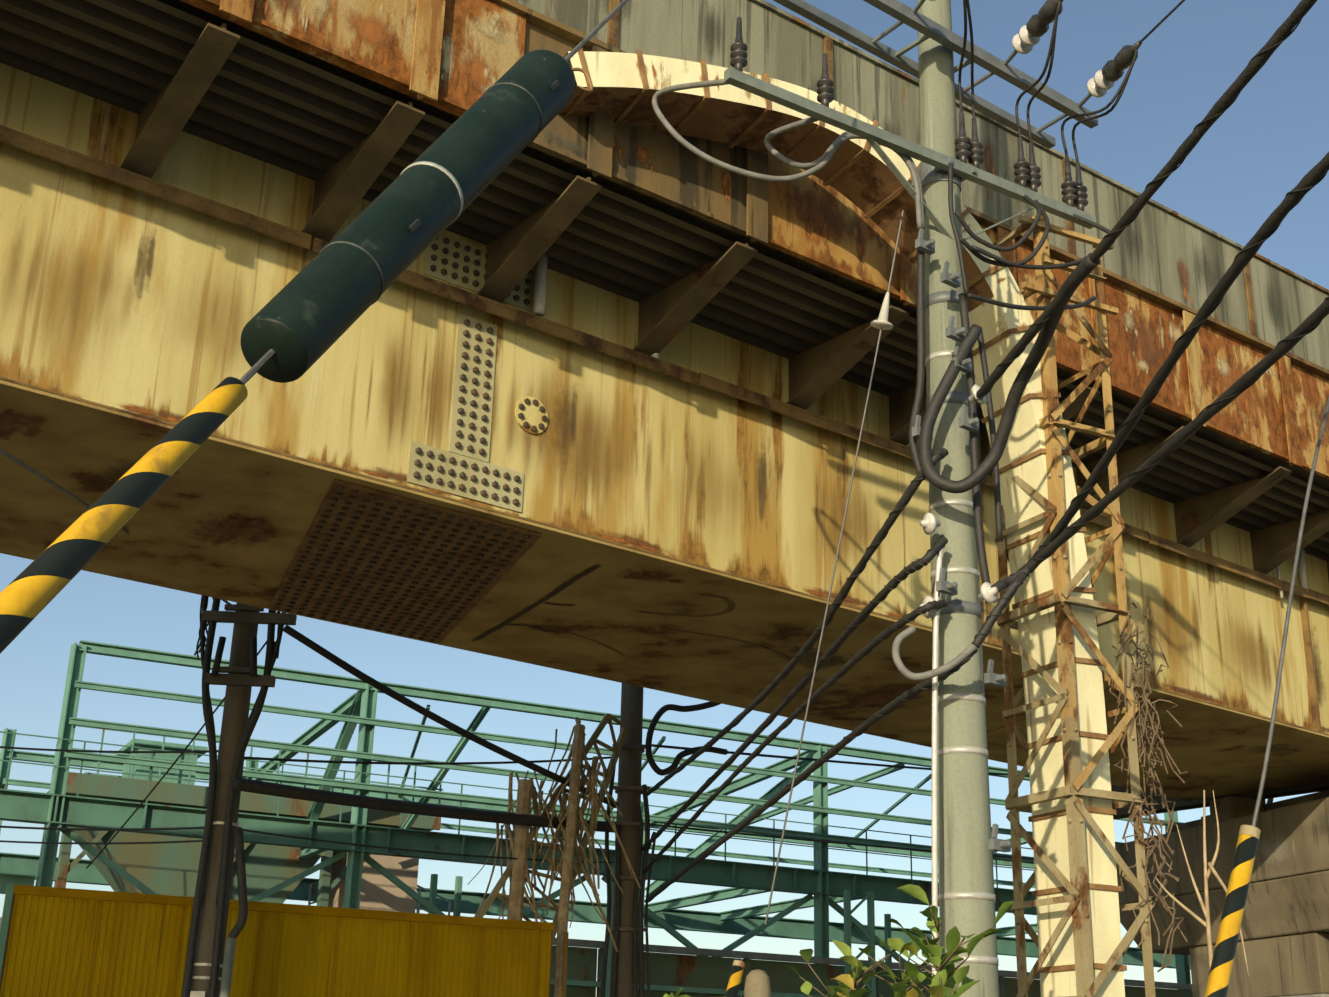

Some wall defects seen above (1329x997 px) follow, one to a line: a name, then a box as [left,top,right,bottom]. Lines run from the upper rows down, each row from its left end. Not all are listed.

rust [256,0,297,24]
rust [350,14,389,63]
rust [778,187,863,258]
rust [1178,260,1193,305]
rust [1214,366,1264,419]
rust [124,405,184,422]
rust [598,534,660,552]
rust [807,589,868,606]
rust [1168,685,1222,704]